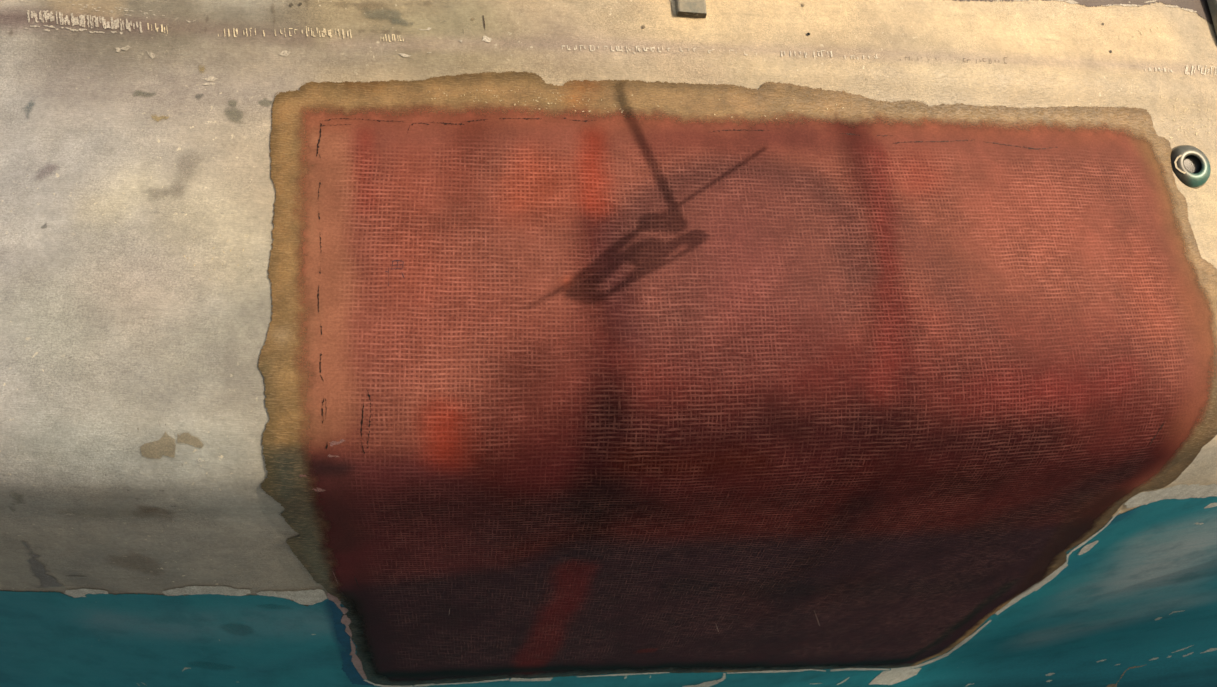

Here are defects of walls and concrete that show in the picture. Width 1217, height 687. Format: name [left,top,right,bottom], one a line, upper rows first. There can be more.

peeling [218,26,352,56]
water stain [141,424,204,462]
peeling [64,589,108,598]
peeling [682,483,1217,687]
peeling [162,586,553,687]